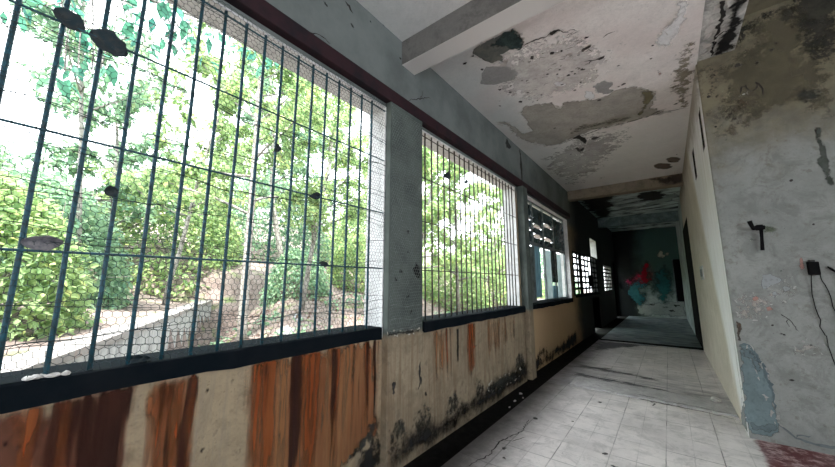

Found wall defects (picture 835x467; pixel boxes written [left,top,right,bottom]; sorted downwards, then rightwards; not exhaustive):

peeling [463,28,677,155]
damp [716,0,835,135]
rust [0,386,134,467]
rust [146,374,198,467]
rust [249,340,379,467]
rust [467,323,475,373]
damp [391,331,577,466]
flaking render [740,343,784,436]